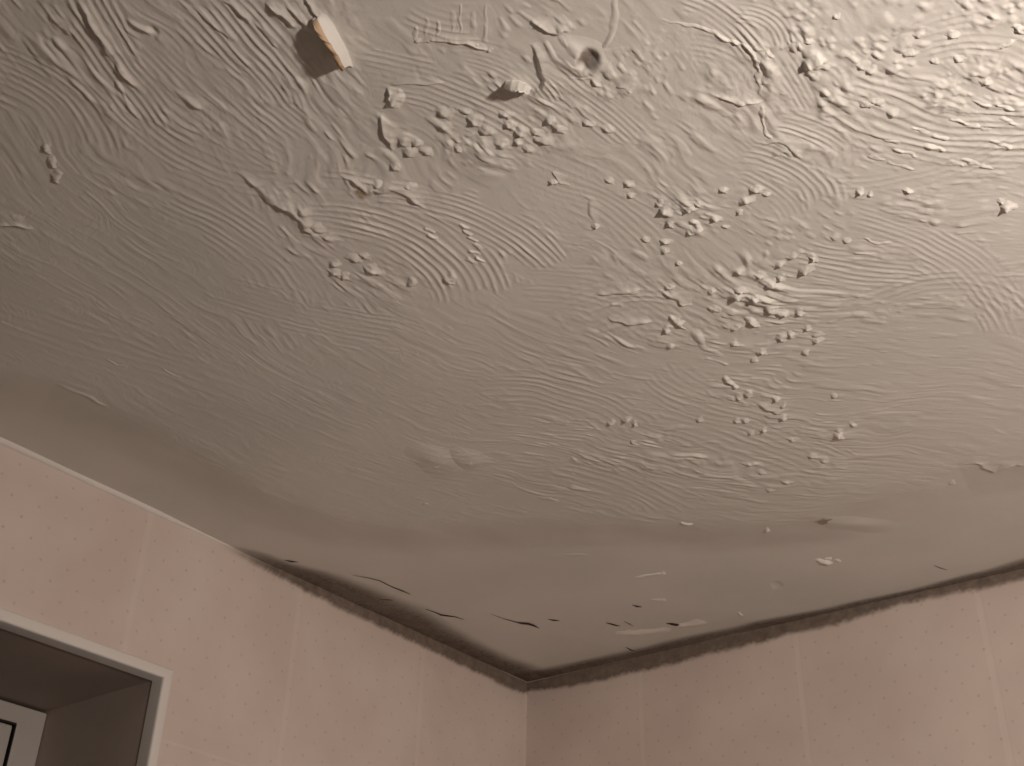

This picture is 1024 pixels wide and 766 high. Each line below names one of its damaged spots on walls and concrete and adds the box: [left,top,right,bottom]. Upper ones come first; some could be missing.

peeling [312,13,353,71]
crack [354,575,464,620]
crack [492,614,559,628]
mould [256,558,1024,692]